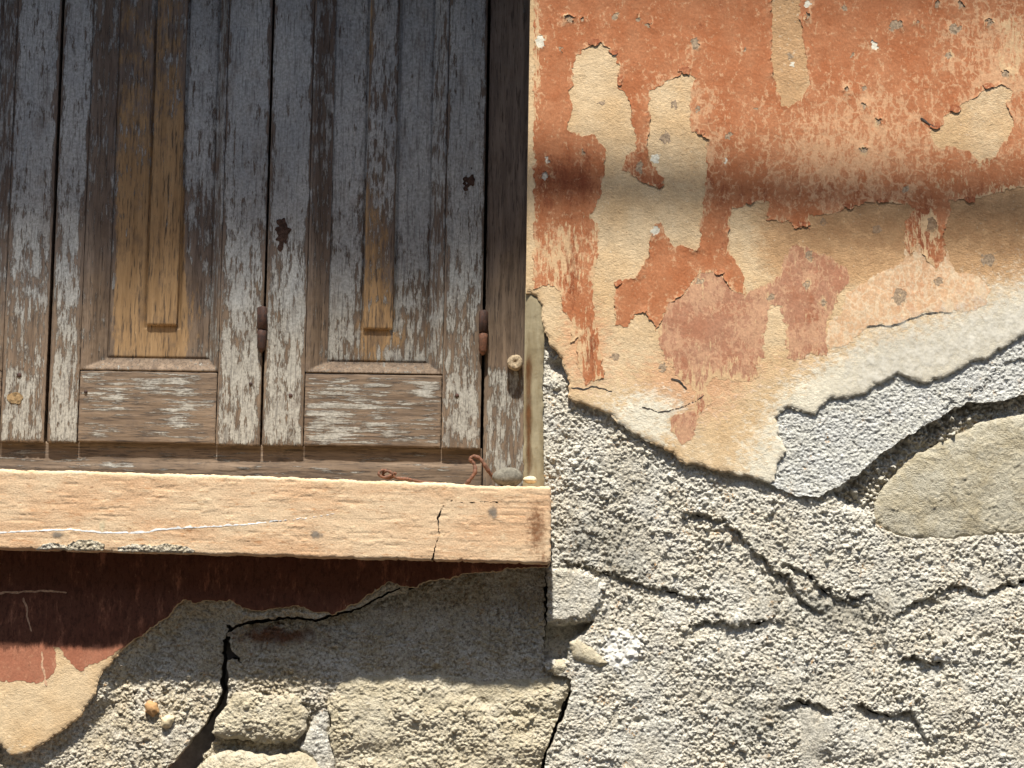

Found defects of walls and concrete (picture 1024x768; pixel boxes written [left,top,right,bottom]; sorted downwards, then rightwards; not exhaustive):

spalling [527,0,1024,768]
crack [431,500,498,561]
spalling [0,567,572,768]
crack [177,588,400,762]